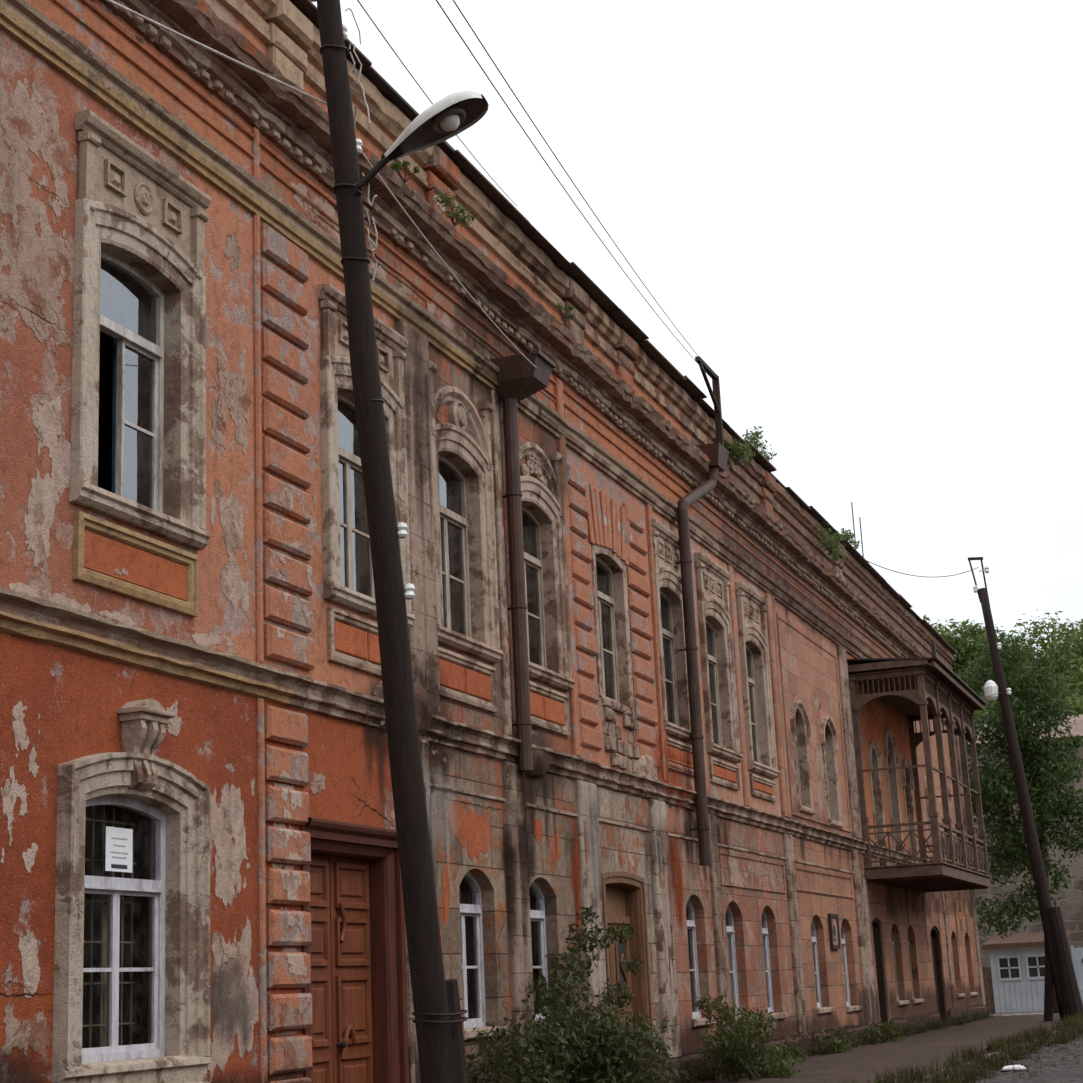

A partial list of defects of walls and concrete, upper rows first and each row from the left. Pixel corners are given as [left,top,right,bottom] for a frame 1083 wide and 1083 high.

peeling [0,77,89,356]
peeling [210,356,252,455]
leakage [401,321,442,492]
peeling [23,397,86,573]
peeling [9,582,135,626]
peeling [210,481,249,616]
peeling [0,701,40,863]
peeling [22,843,38,873]
peeling [209,777,255,910]
peeling [0,1004,53,1066]
peeling [18,930,40,999]
peeling [207,916,310,1083]